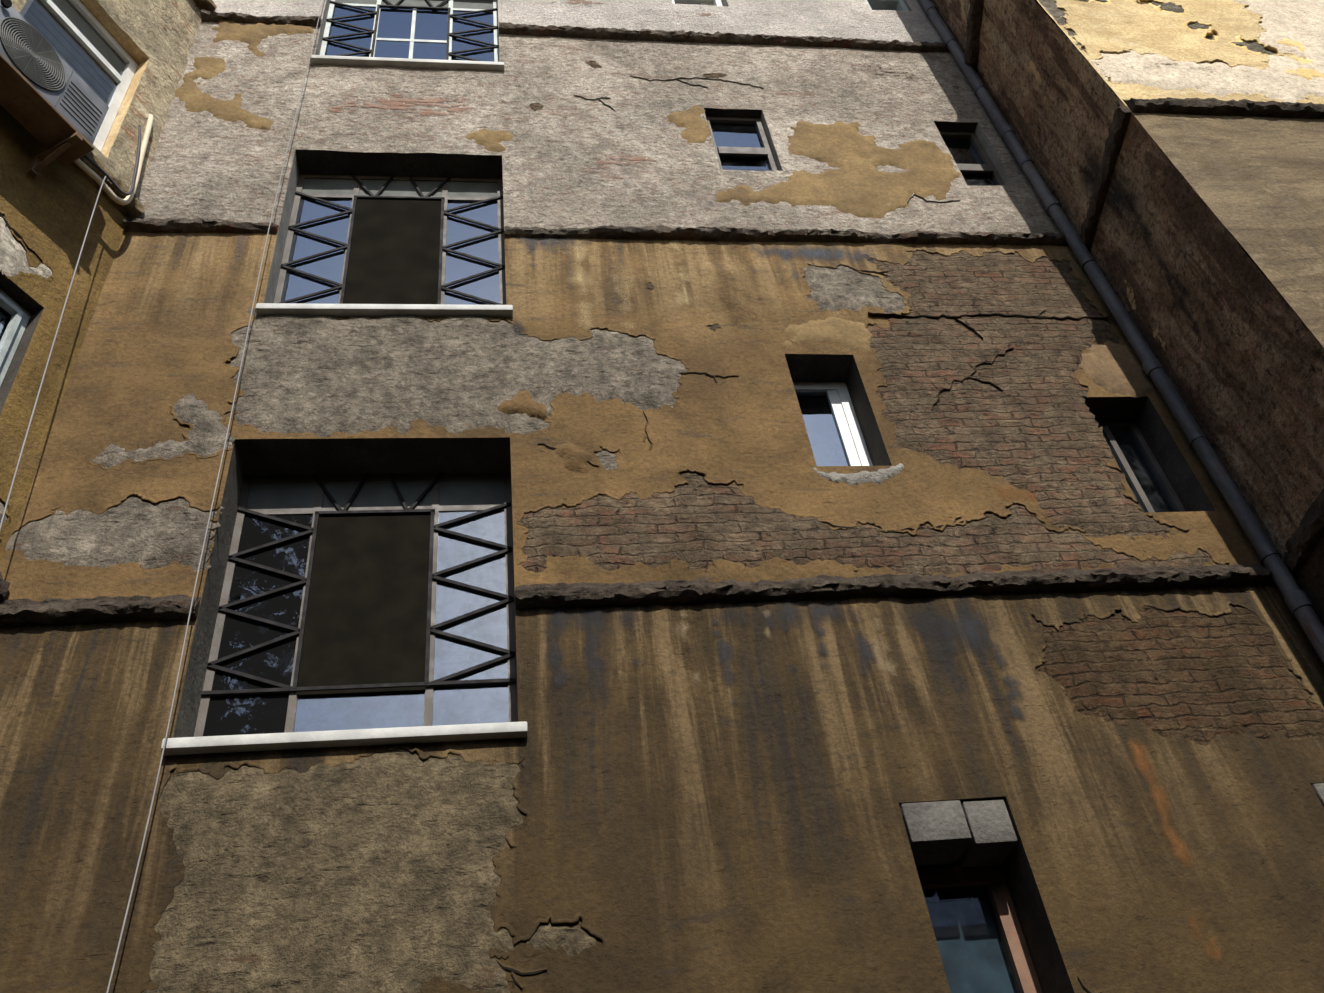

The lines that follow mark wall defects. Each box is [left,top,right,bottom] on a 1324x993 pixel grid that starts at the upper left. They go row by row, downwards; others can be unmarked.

spalling [1038,0,1324,103]
spalling [0,211,55,282]
spalling [87,307,692,471]
spalling [514,249,1232,577]
spalling [0,492,224,576]
damp [763,603,836,654]
spalling [132,745,608,993]